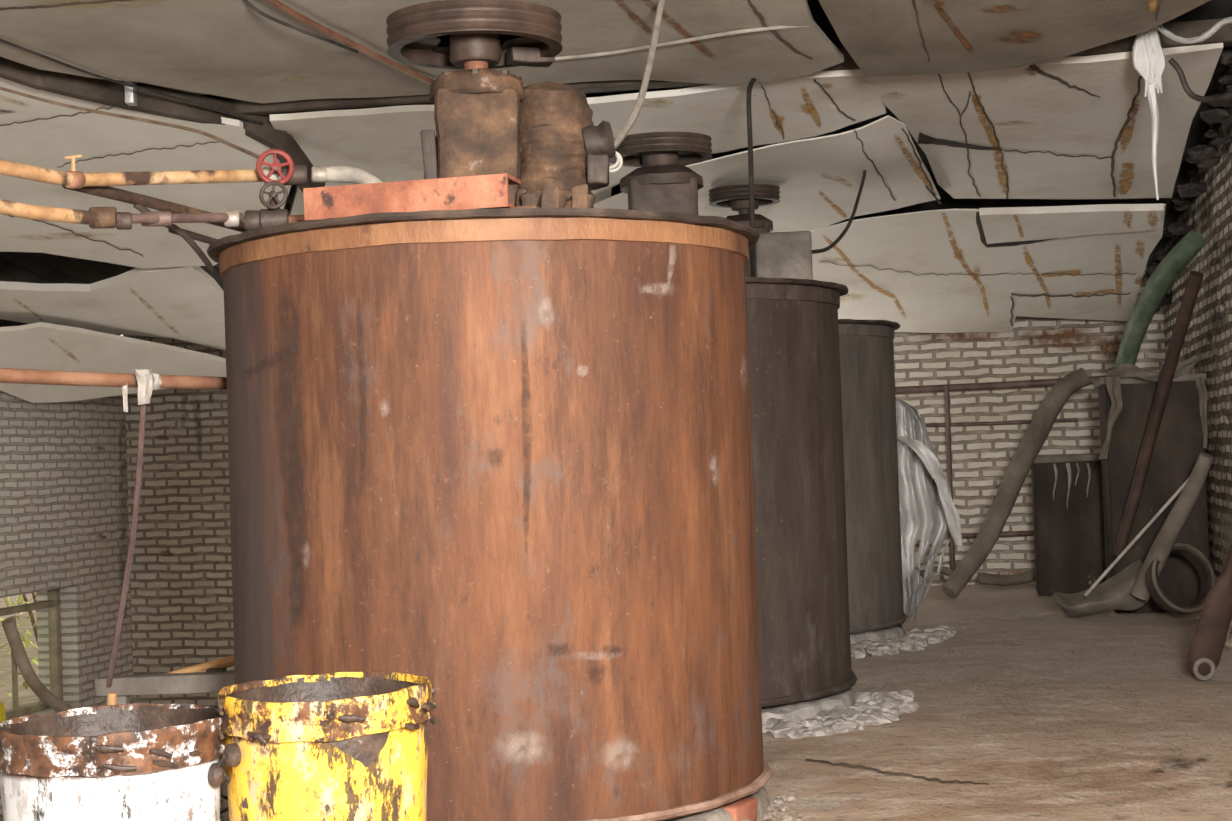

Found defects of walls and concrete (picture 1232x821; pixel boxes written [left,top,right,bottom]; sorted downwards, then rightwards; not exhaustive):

rust [617,0,652,33]
rust [644,0,709,53]
rust [802,90,821,126]
crack [747,0,896,201]
crack [822,0,1142,326]
rust [973,95,1007,192]
rust [1118,104,1138,194]
rust [826,239,904,313]
rust [943,213,988,314]
rust [1024,252,1080,307]
rust [1077,246,1142,302]
crack [805,759,989,785]